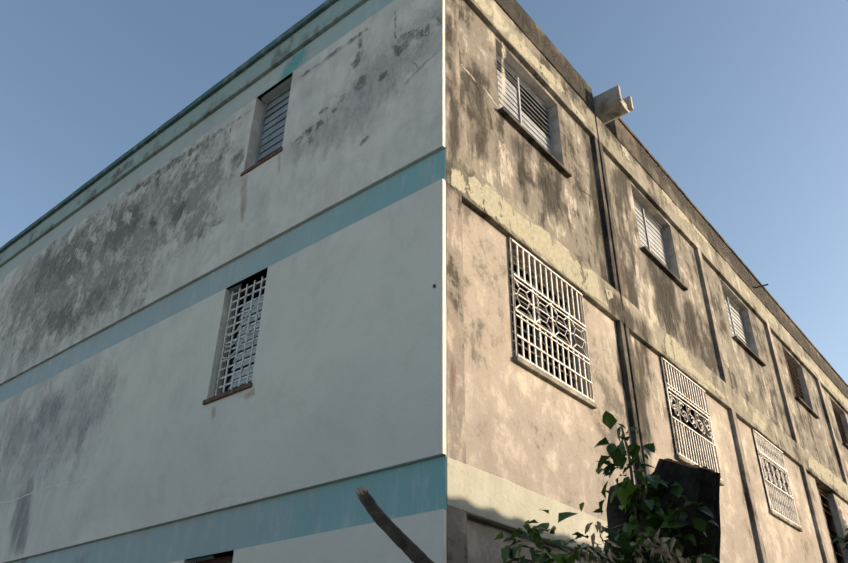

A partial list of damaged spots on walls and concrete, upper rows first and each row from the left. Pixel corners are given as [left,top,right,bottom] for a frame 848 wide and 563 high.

water stain [394,14,456,56]
water stain [497,0,591,106]
water stain [447,58,459,174]
water stain [470,64,488,157]
water stain [499,138,576,228]
water stain [10,129,231,352]
water stain [601,123,848,398]